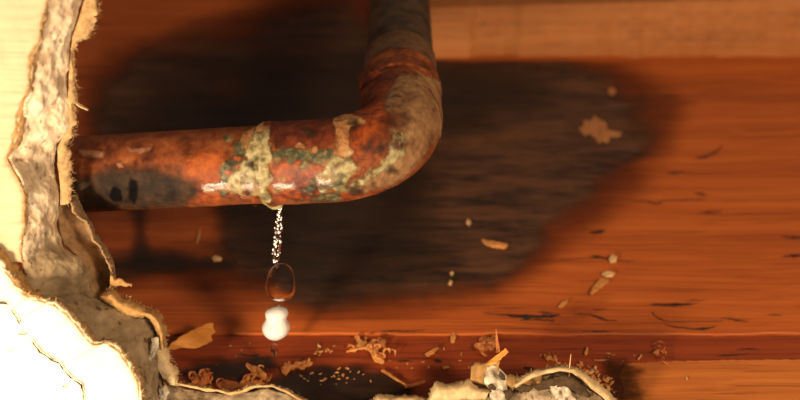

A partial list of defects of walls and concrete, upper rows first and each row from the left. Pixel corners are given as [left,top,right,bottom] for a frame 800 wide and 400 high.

corrosion [349,69,391,160]
leakage [71,0,669,309]
corrosion [272,160,326,201]
corrosion [338,180,401,201]
spalling [148,337,159,361]
spalling [158,384,170,400]
spalling [484,365,591,400]